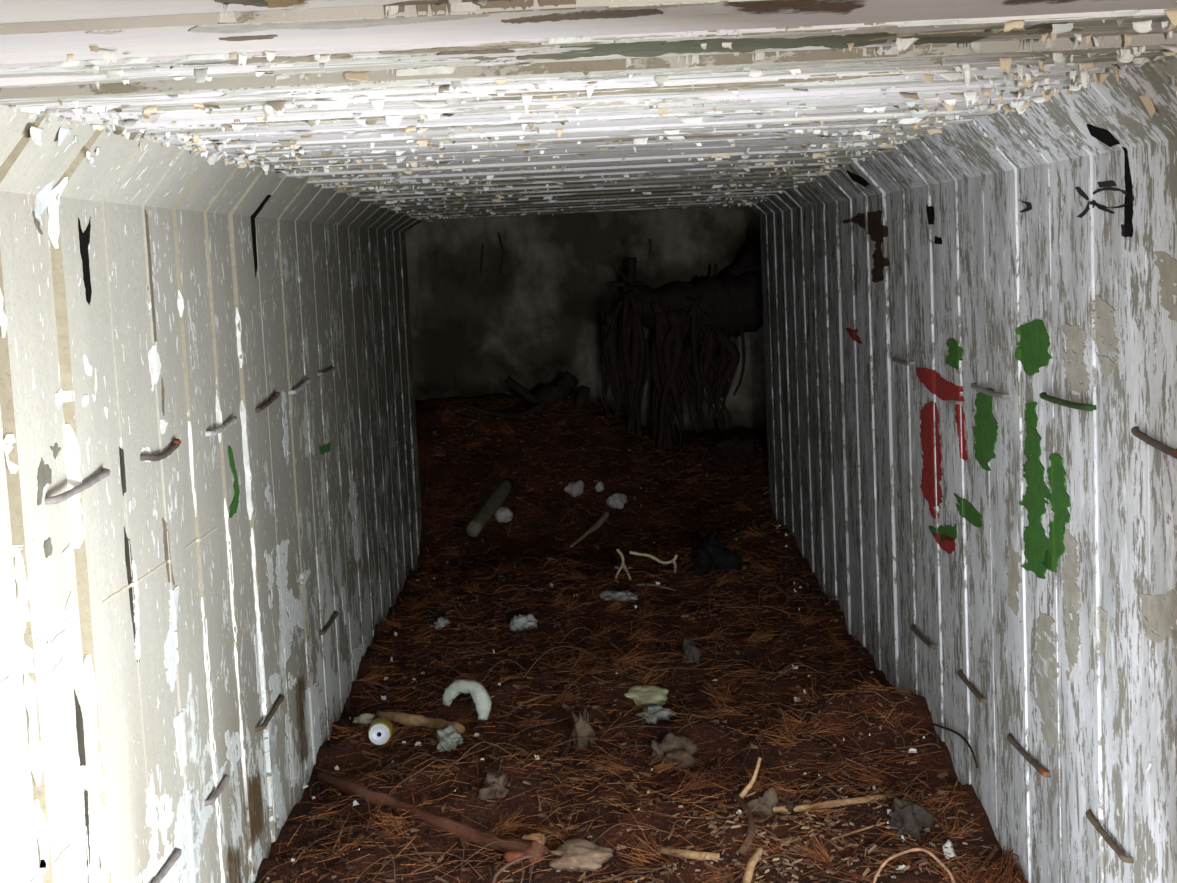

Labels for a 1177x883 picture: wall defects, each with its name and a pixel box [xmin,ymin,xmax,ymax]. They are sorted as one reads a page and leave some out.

peeling [0,0,1177,222]
peeling [32,177,68,249]
peeling [148,342,161,391]
peeling [235,307,243,368]
peeling [1061,293,1120,403]
peeling [1154,251,1177,322]
peeling [188,421,197,517]
peeling [5,424,114,883]
peeling [131,560,141,660]
peeling [133,498,246,883]
peeling [240,390,321,829]
peeling [1032,529,1081,748]